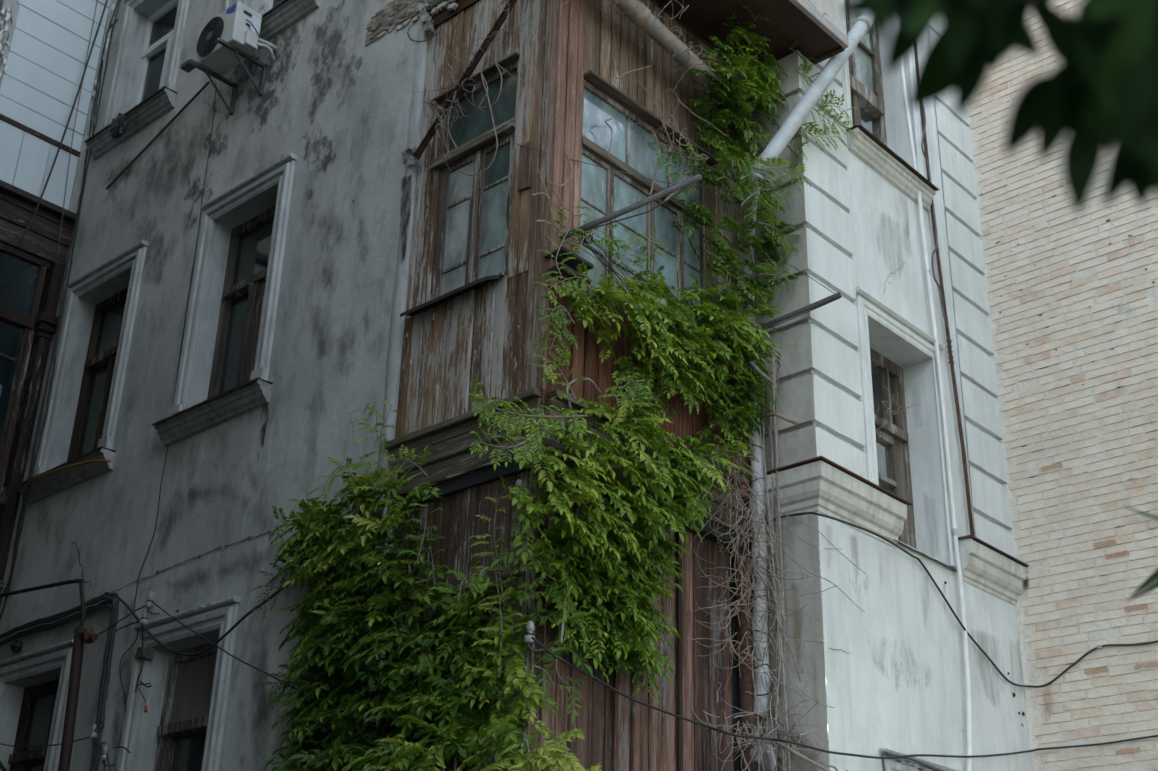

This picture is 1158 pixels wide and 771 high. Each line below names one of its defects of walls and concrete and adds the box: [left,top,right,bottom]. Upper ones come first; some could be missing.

peeling [0,0,21,77]
damp [231,22,298,124]
damp [303,1,362,171]
flaking render [364,0,458,46]
damp [147,100,228,228]